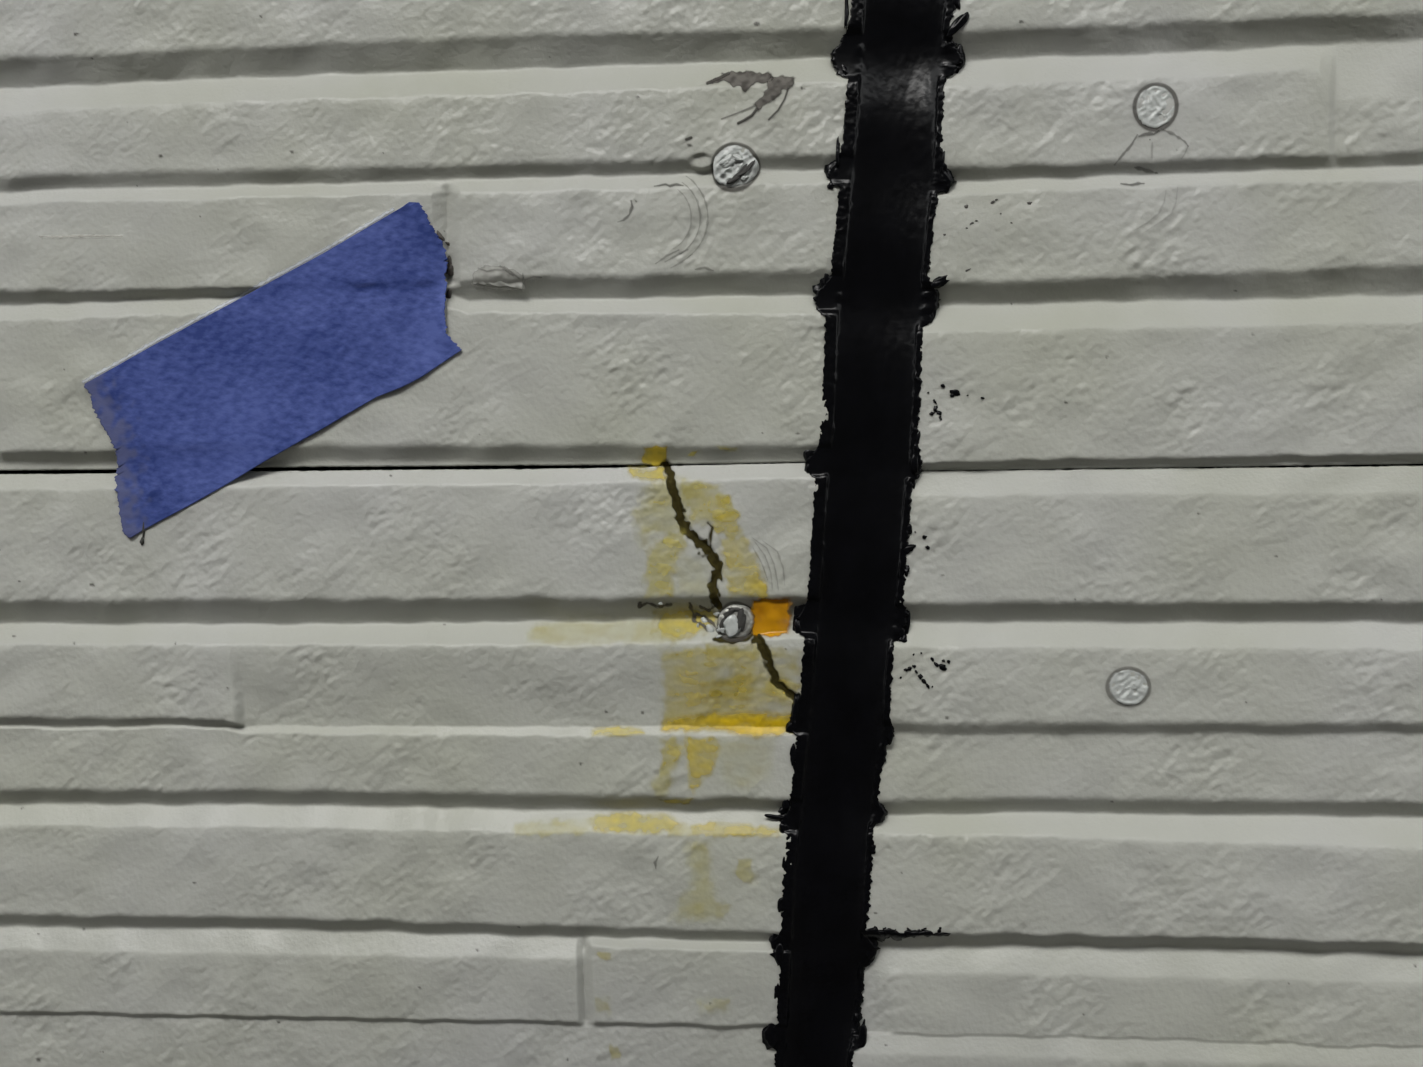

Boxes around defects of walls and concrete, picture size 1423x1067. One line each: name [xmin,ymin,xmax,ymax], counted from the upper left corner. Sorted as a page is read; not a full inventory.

crack [661,462,795,700]